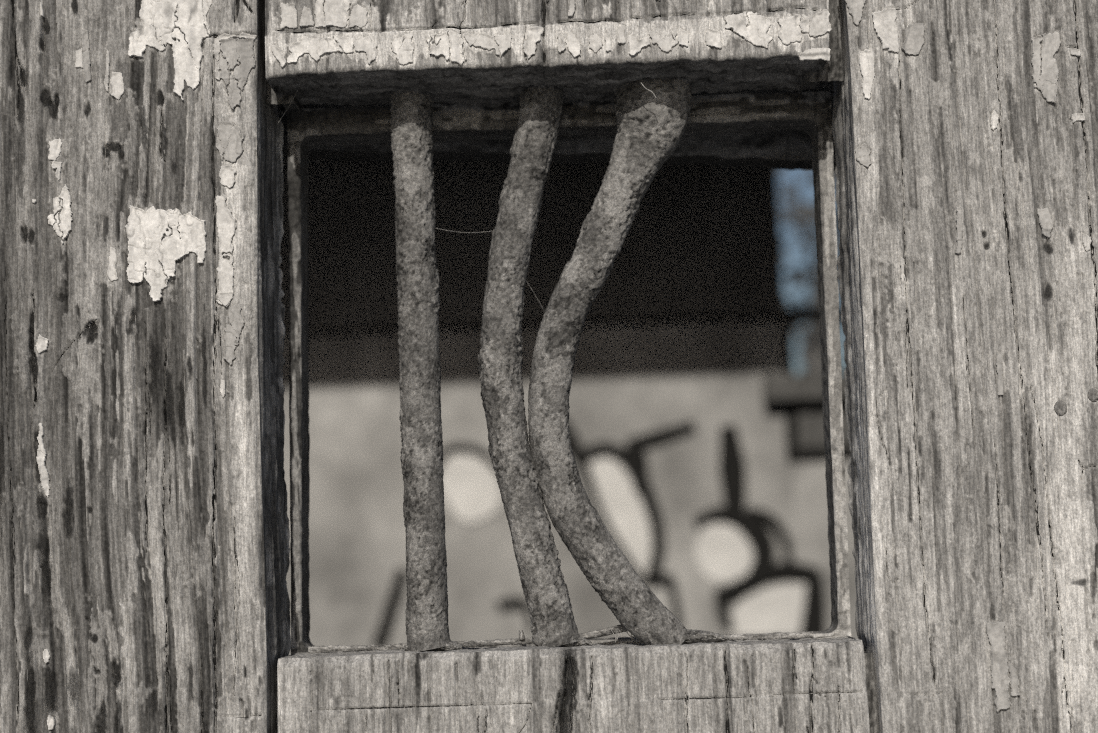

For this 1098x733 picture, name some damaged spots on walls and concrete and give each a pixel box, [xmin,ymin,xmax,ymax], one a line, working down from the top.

peeling [272,0,378,68]
peeling [705,9,832,62]
peeling [844,0,925,100]
peeling [1031,31,1081,104]
crack [1068,0,1087,168]
peeling [47,139,73,244]
peeling [104,0,257,365]
crack [200,0,690,733]
crack [876,60,938,697]
crack [994,0,1072,731]
crack [1088,196,1098,374]
crack [145,324,173,733]